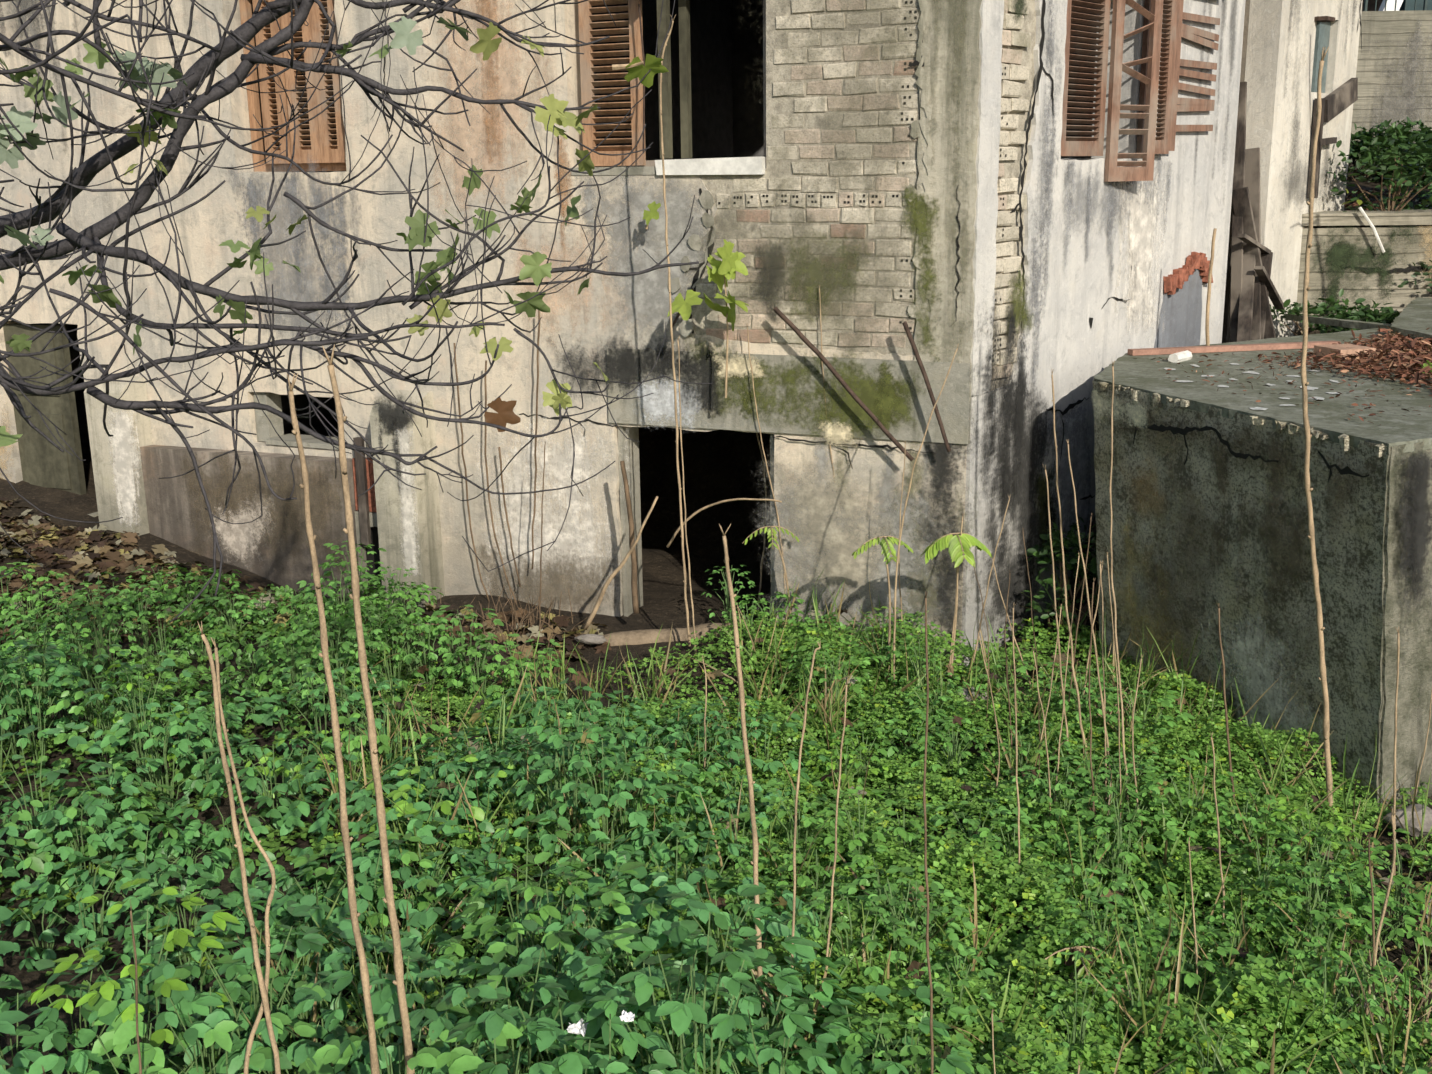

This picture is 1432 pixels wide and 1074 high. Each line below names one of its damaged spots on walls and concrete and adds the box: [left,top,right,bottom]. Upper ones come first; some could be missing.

crack [1010,0,1054,337]
damp [752,244,787,320]
spalling [1154,252,1213,348]
damp [563,335,749,423]
damp [973,108,1170,639]
crack [1046,397,1278,465]
crack [1318,451,1369,482]
damp [1400,452,1432,611]